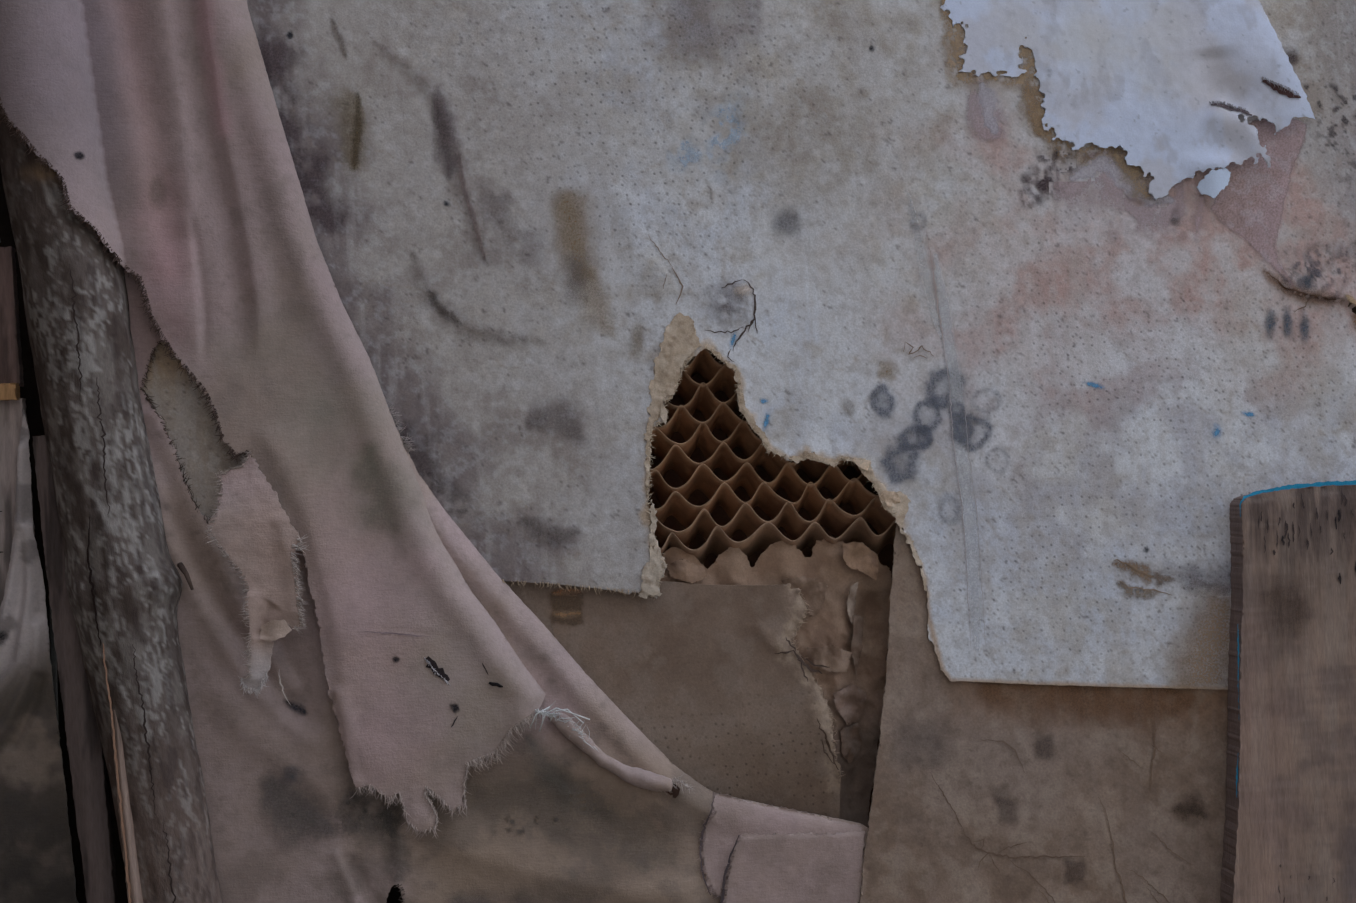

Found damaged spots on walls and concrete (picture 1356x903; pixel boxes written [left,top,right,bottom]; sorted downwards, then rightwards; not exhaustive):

peeling [940,0,1316,297]
crack [1264,269,1356,325]
peeling [639,313,771,599]
damp [871,368,894,416]
damp [882,370,992,482]
peeling [790,451,928,594]
crack [932,776,1170,903]